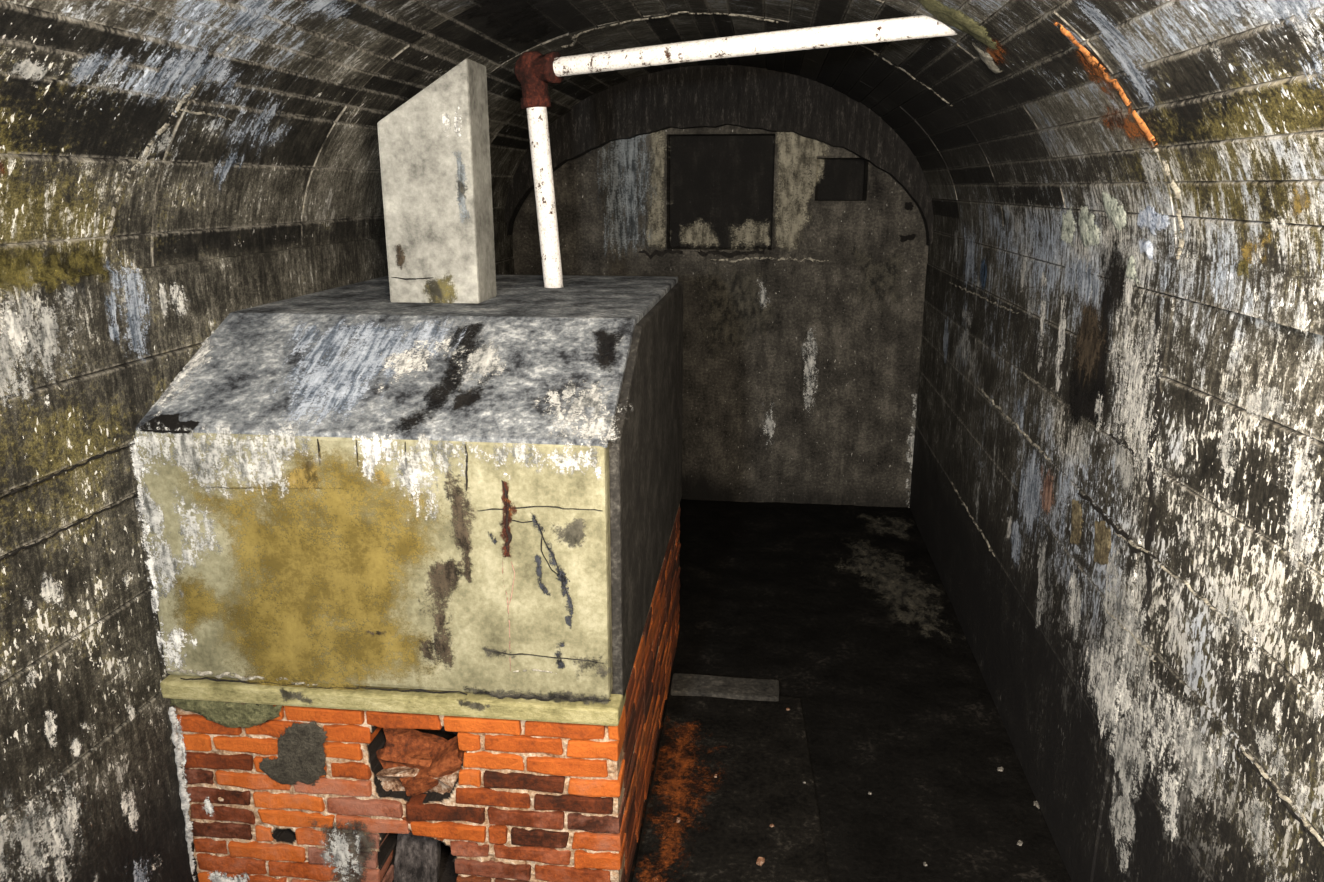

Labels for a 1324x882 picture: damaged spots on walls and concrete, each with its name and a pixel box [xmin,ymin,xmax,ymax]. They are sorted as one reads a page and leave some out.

crack [561,11,779,48]
leakage [596,130,829,360]
leakage [0,285,80,408]
leakage [104,260,189,363]
leakage [1006,232,1163,626]
leakage [25,573,64,610]
leakage [129,319,622,710]
corrosion [500,473,517,671]
leakage [44,710,90,756]
spalling [376,728,465,797]
leakage [1067,545,1229,873]
leakage [1254,701,1308,813]